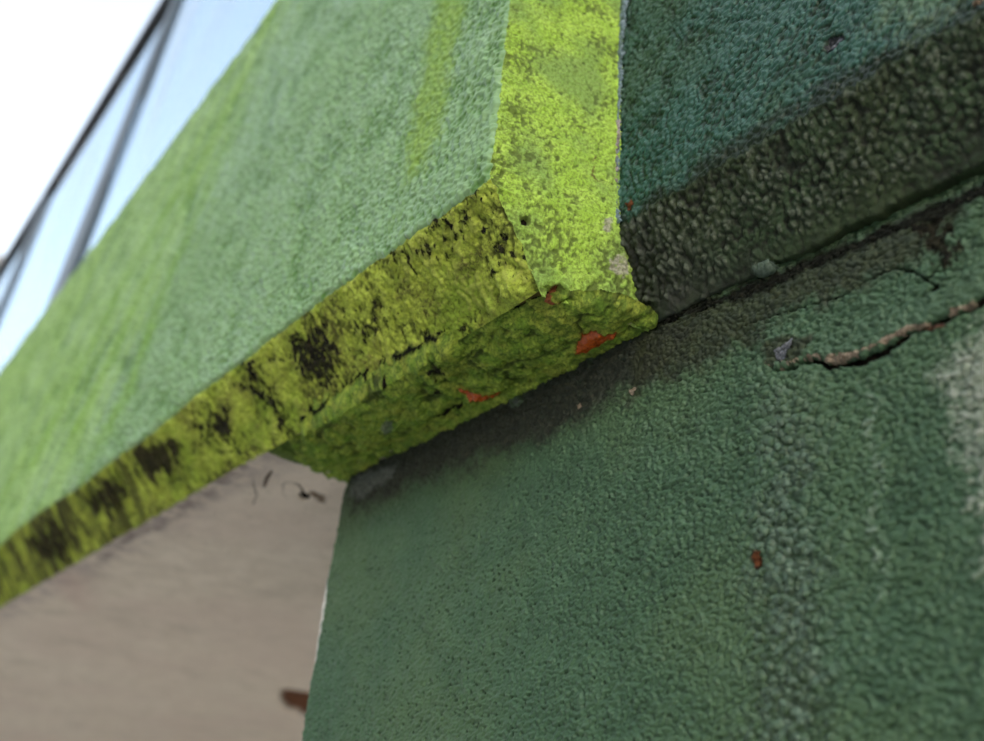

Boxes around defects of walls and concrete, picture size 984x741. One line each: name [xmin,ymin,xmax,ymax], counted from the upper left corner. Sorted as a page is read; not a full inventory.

water stain [389,185,527,278]
water stain [19,82,255,523]
water stain [133,284,399,488]
water stain [340,336,652,532]
corrosion [560,323,629,359]
crack [765,264,984,371]
water stain [21,515,119,620]